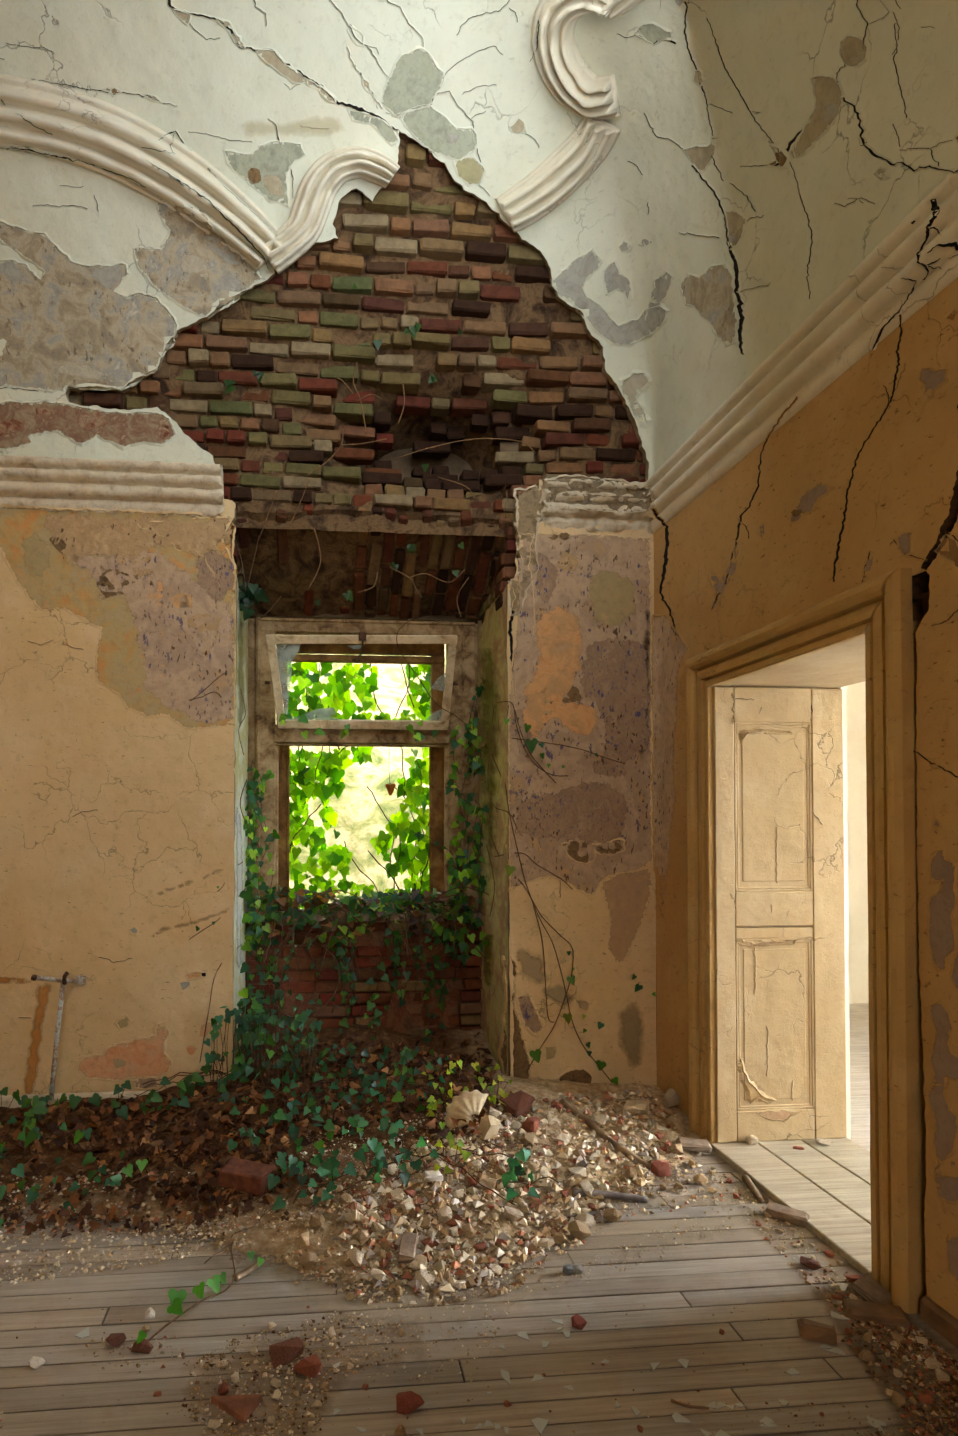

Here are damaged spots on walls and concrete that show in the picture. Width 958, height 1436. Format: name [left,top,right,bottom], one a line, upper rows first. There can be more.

crack [0,0,541,269]
crack [617,0,876,355]
crack [832,0,958,582]
spalling [0,18,748,965]
crack [931,609,958,627]
crack [913,749,958,778]
peeling [75,1013,211,1091]